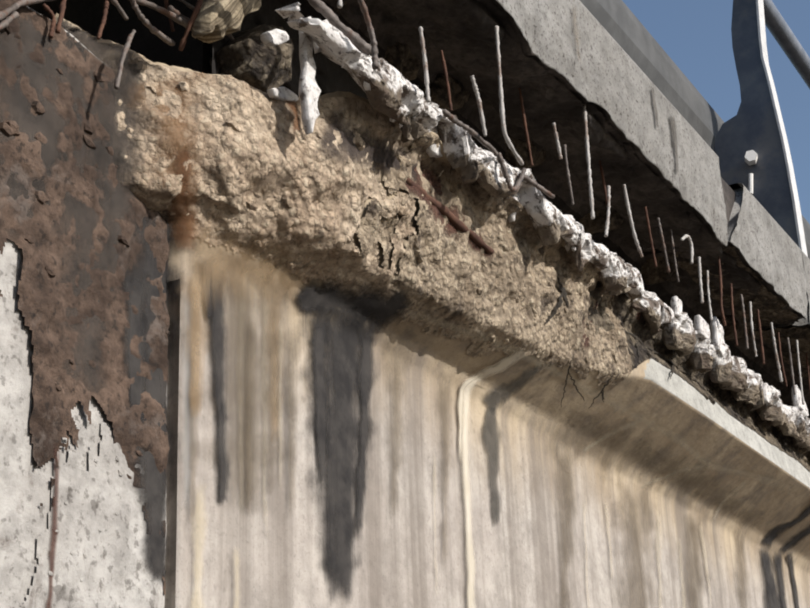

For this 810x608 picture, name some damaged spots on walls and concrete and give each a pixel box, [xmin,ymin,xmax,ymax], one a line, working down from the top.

rust [173,152,204,246]
spalling [0,0,424,608]
damp [201,259,229,501]
damp [297,282,410,597]
rust [405,156,489,254]
damp [483,366,539,522]
crack [545,278,569,324]
crack [561,357,613,409]
spalling [382,0,810,471]
rust [47,453,59,608]
damp [761,507,810,608]